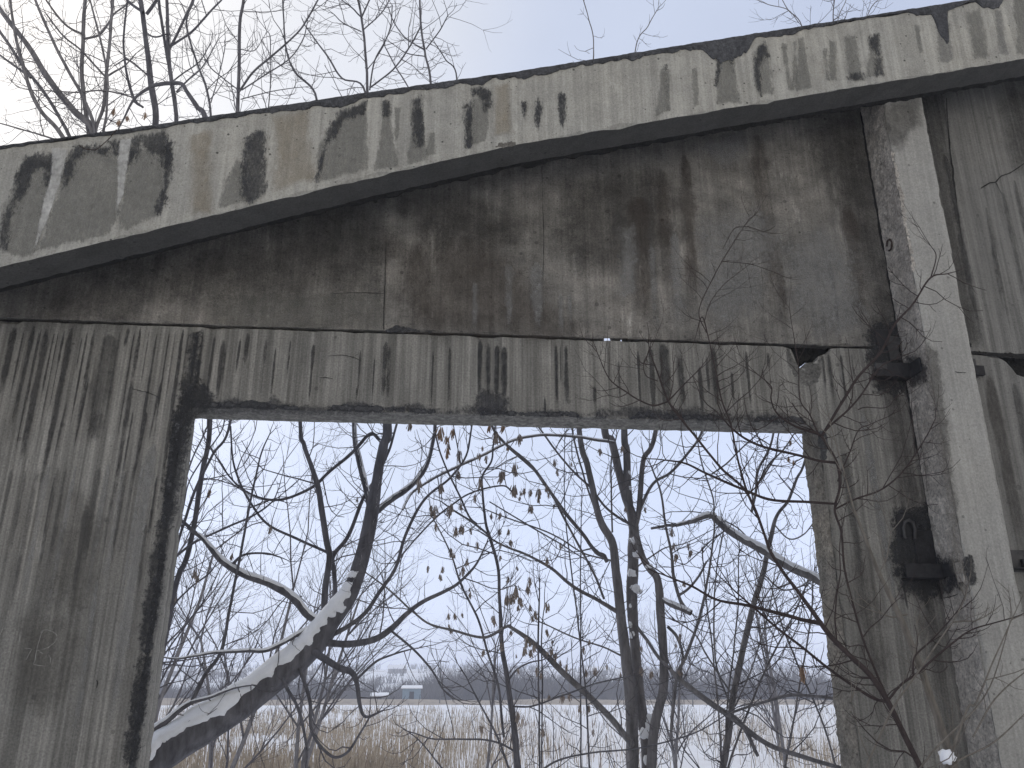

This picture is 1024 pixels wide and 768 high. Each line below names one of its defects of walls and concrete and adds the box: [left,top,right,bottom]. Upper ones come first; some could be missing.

leakage [462,86,492,148]
leakage [521,98,543,129]
leakage [558,93,567,127]
leakage [715,59,740,104]
leakage [754,44,773,95]
leakage [823,33,884,80]
leakage [0,129,174,257]
leakage [220,130,268,207]
leakage [476,341,509,417]
leakage [544,347,569,412]
leakage [637,345,685,405]
leakage [1,329,249,670]